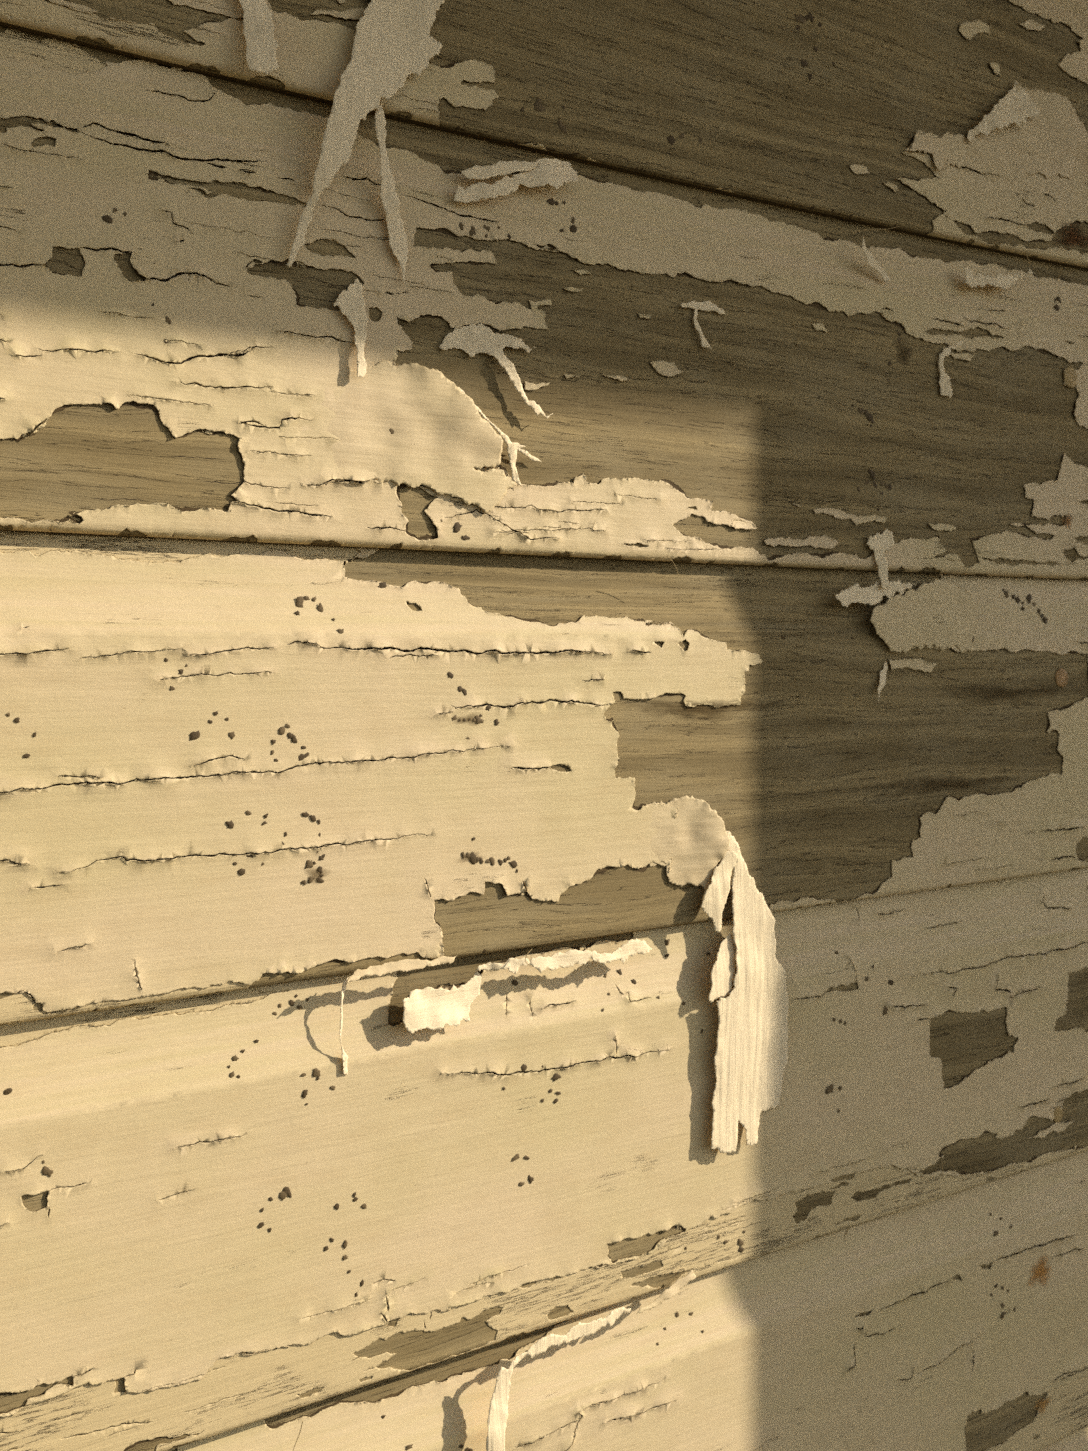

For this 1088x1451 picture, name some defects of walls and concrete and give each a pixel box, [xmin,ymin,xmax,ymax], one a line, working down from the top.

peeling [268,0,371,31]
crack [83,124,290,180]
peeling [357,0,1088,286]
crack [0,227,33,268]
crack [85,224,225,286]
peeling [0,228,1088,1048]
crack [0,627,602,714]
crack [0,746,547,793]
crack [91,834,423,864]
peeling [929,1007,1017,1087]
peeling [0,1089,1088,1451]